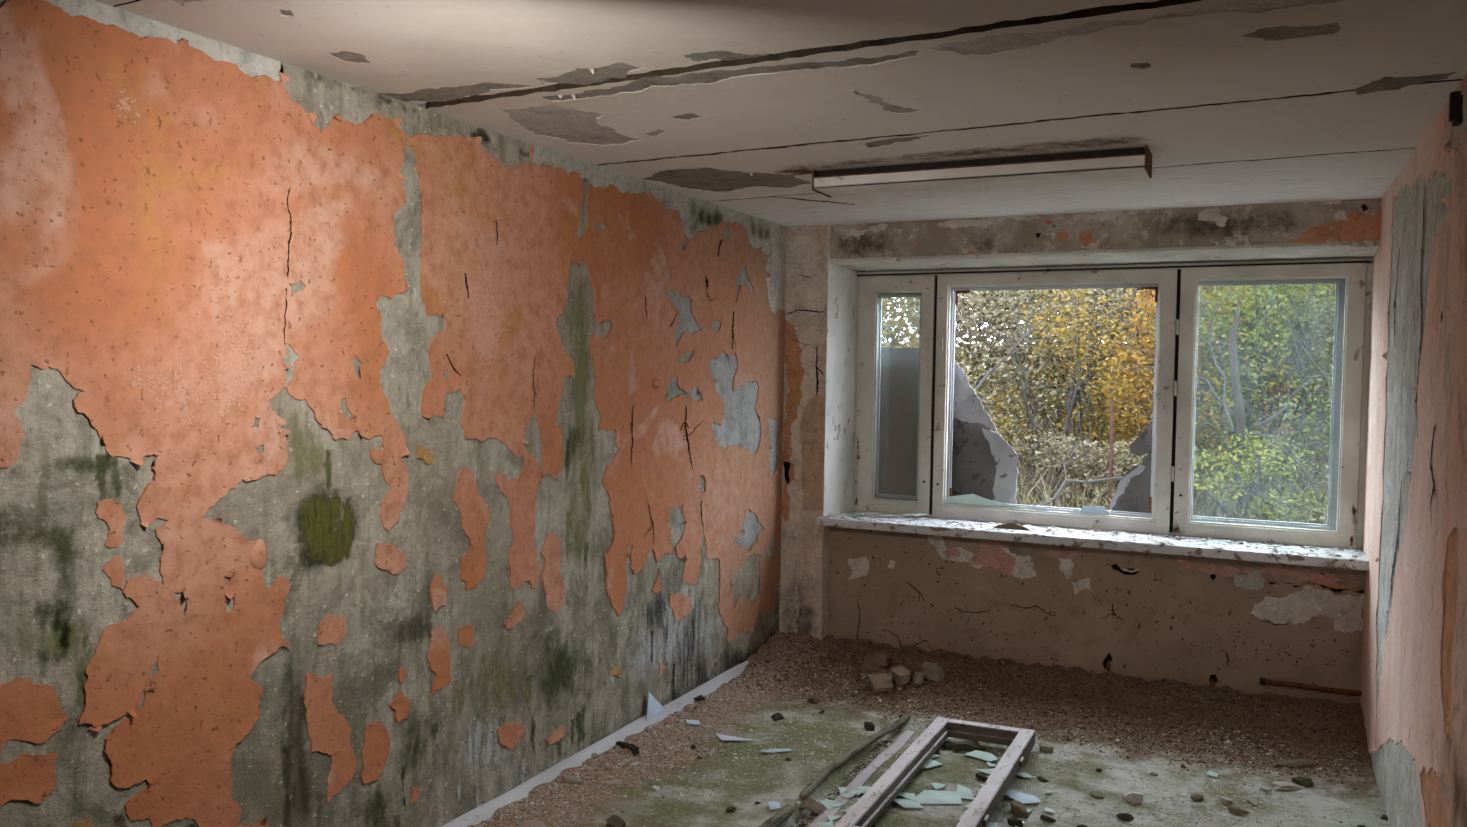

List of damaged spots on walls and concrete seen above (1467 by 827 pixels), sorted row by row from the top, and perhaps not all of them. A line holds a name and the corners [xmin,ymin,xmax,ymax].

peeling [929,0,1340,55]
peeling [1354,72,1467,153]
leakage [64,454,120,496]
peeling [0,0,919,827]
peeling [821,170,1452,704]
leakage [0,522,76,583]
leakage [36,602,92,706]
leakage [541,644,590,703]
leakage [622,579,746,706]
peeling [1442,529,1459,734]
leakage [452,700,534,807]
peeling [1370,738,1448,827]